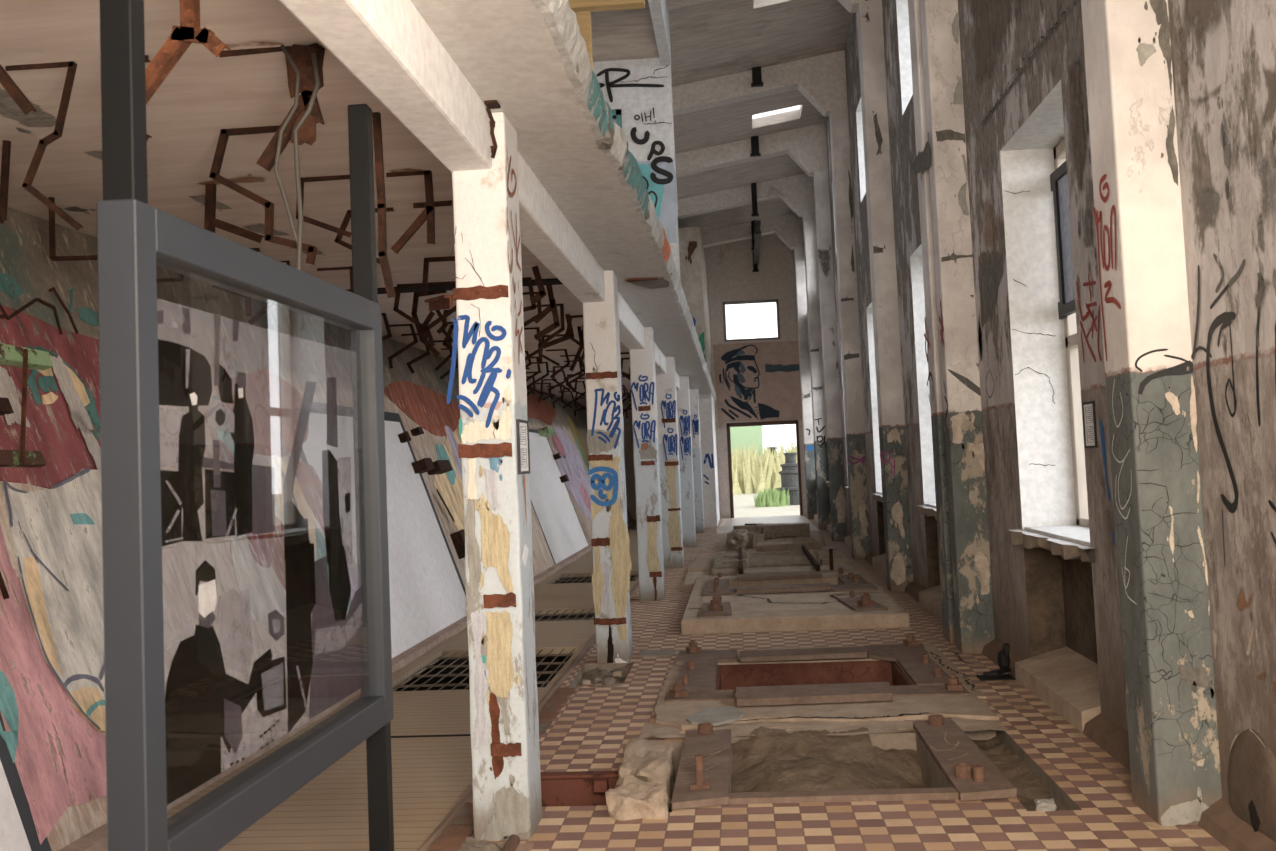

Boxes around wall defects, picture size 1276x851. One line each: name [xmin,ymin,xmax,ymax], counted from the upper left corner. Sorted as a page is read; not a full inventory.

spalling [0,89,57,134]
peeling [1136,0,1178,186]
spalling [910,129,969,215]
peeling [941,250,1003,370]
peeling [883,428,904,444]
peeling [951,412,985,472]
peeling [461,385,531,840]
peeling [587,429,632,663]
peeling [639,440,682,601]
peeling [890,501,910,586]
peeling [974,552,990,604]
crack [1137,406,1197,641]